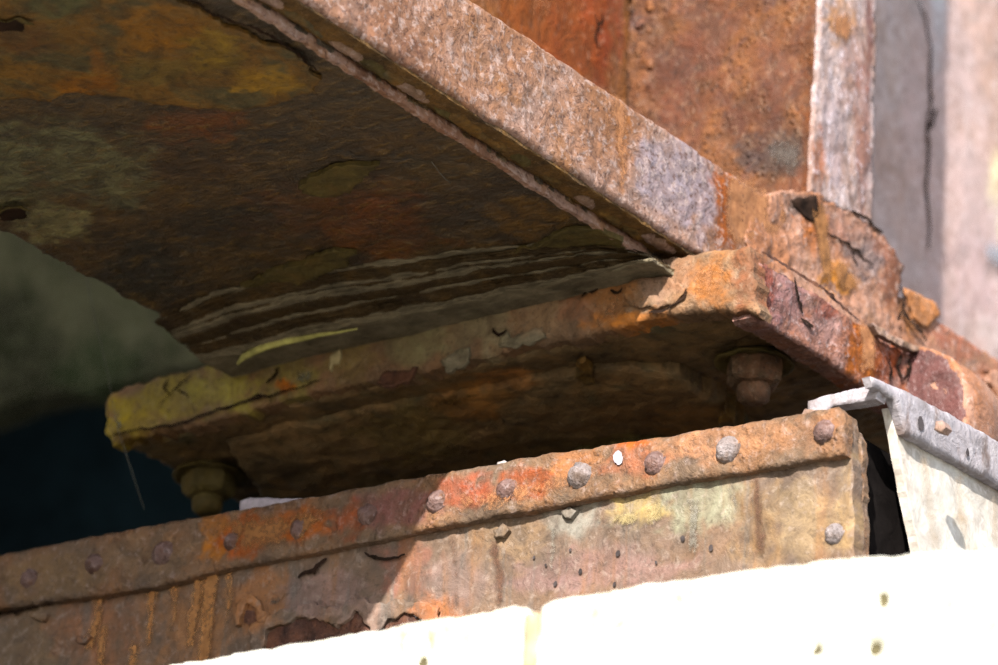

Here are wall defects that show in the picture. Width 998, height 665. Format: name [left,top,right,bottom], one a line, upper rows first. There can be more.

hole [0,17,34,32]
crack [918,0,937,250]
rust [726,177,856,290]
crack [827,233,873,266]
crack [852,210,883,233]
rust [154,225,686,378]
crack [762,251,860,328]
rust [903,288,940,327]
crack [889,353,912,381]
rust [718,389,749,428]
rust [570,435,666,451]
rust [171,573,440,662]